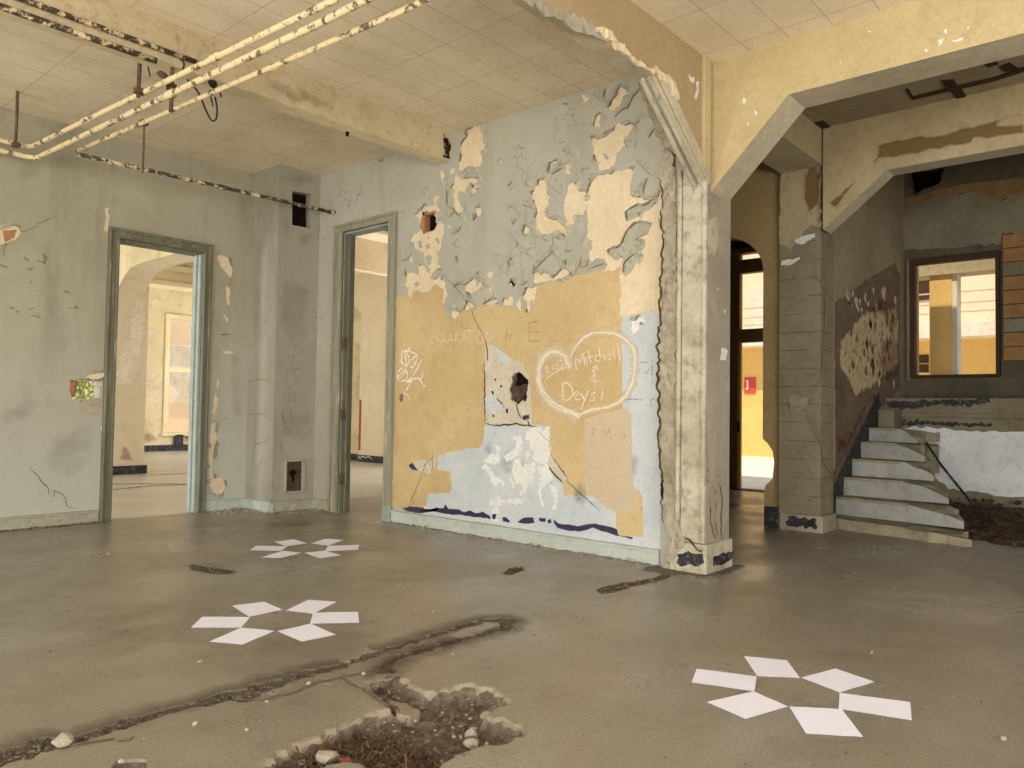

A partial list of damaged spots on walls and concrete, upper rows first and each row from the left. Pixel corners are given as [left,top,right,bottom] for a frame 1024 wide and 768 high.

spalling [519,0,699,100]
spalling [0,221,21,250]
peeling [404,123,573,319]
peeling [216,253,233,322]
spalling [521,82,734,570]
peeling [838,280,899,396]
flaking render [482,340,567,522]
crack [30,467,74,509]
spalling [252,673,527,768]